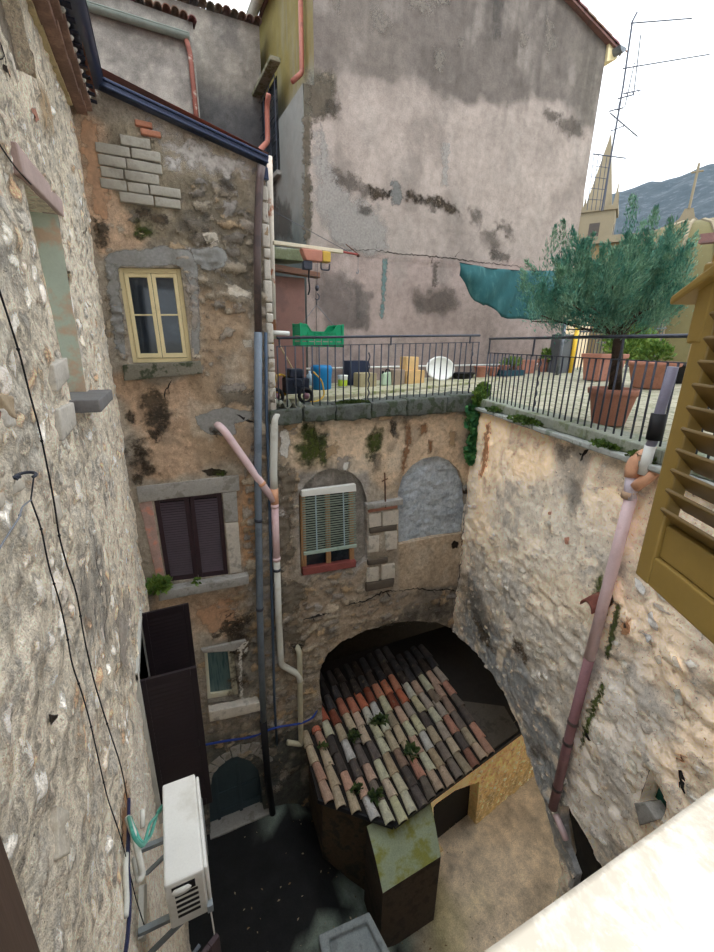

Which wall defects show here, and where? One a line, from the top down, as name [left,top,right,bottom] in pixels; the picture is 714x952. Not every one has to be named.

flaking render [301,73,336,241]
damp [312,129,391,319]
damp [405,190,460,214]
rust [479,424,489,477]
crack [304,515,465,621]